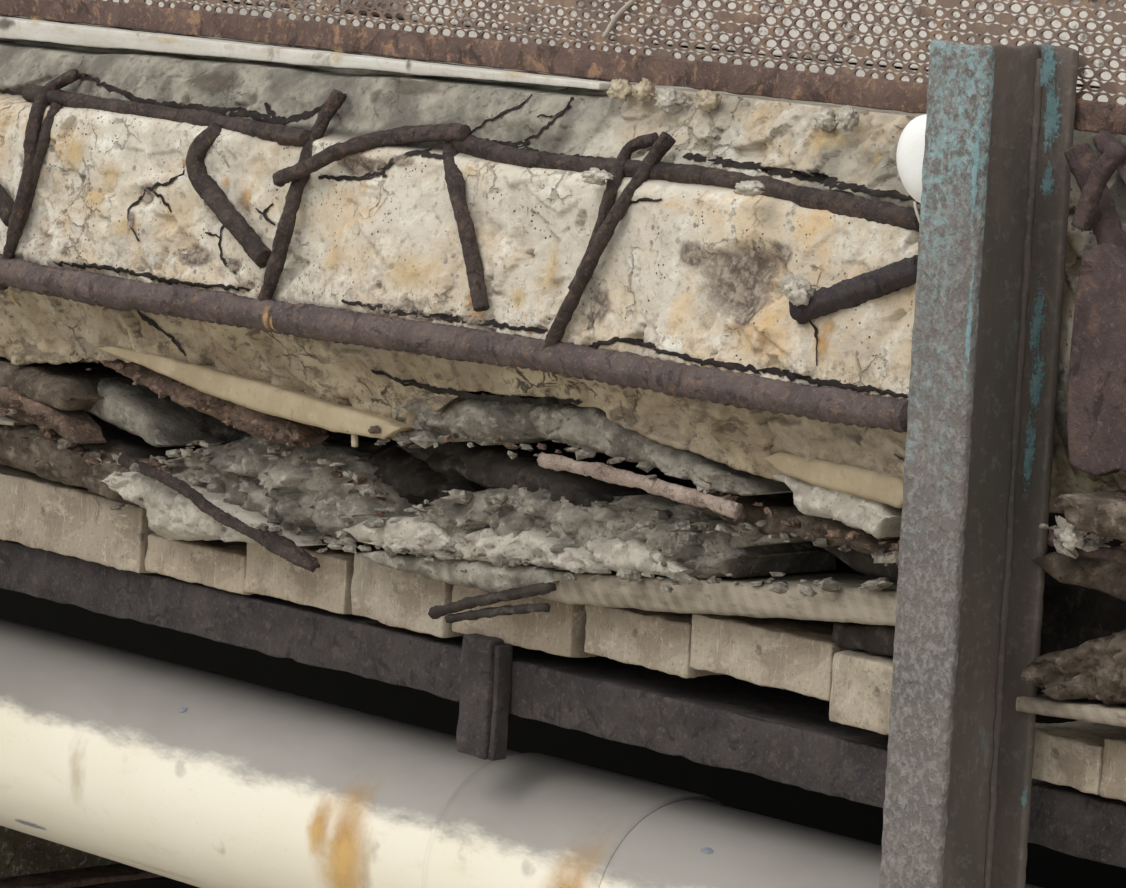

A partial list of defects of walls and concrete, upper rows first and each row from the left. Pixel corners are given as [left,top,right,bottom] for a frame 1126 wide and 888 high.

crack [471,87,599,158]
spalling [338,154,413,178]
crack [318,148,444,181]
crack [127,169,185,242]
crack [53,226,253,291]
spalling [180,244,211,266]
spalling [227,258,240,272]
spalling [363,303,433,321]
spalling [587,287,609,330]
spalling [679,241,791,325]
peeling [772,474,902,538]
rust [310,815,358,888]